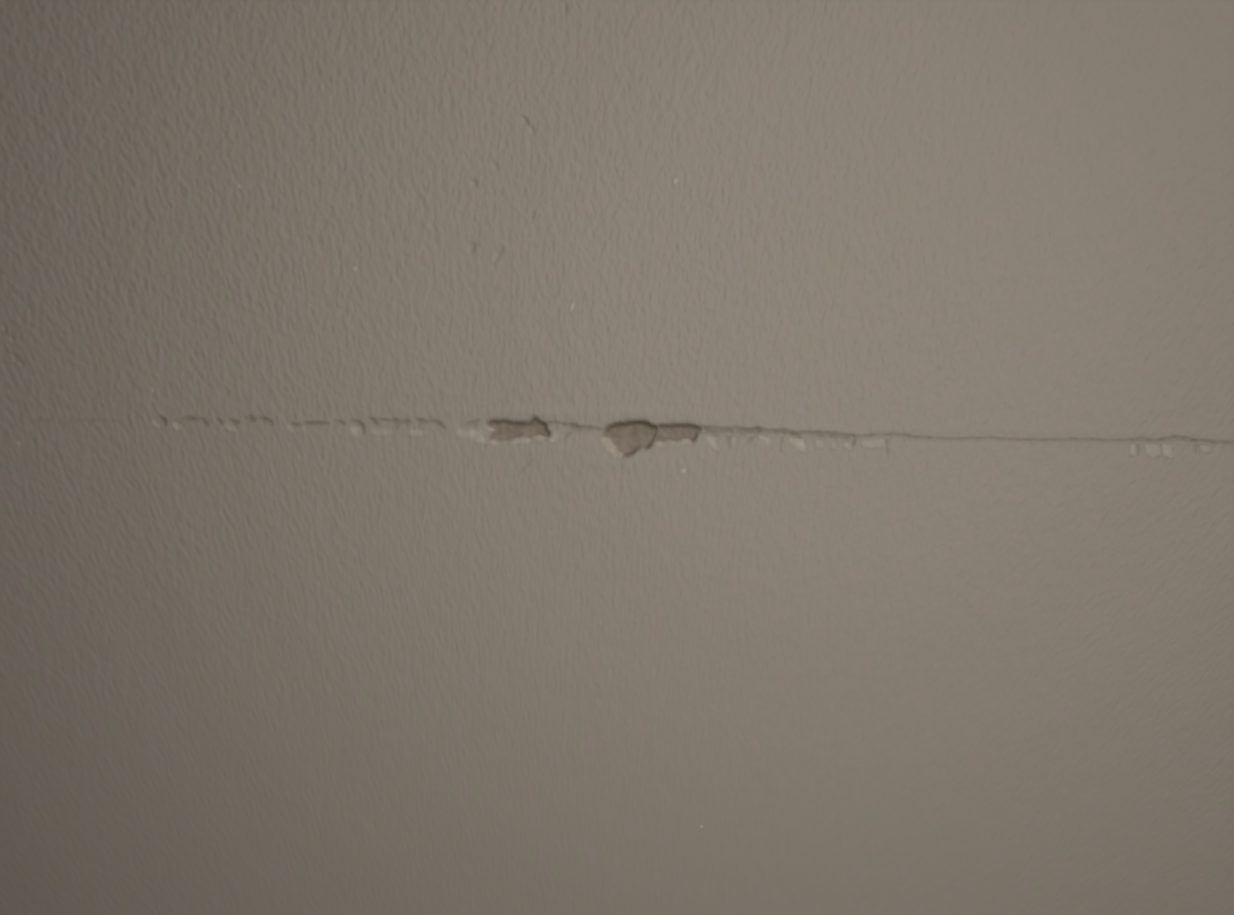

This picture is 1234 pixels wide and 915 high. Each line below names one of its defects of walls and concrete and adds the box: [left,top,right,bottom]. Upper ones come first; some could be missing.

crack [157,414,447,436]
spalling [455,415,553,448]
crack [548,420,604,440]
spalling [599,419,721,460]
crack [700,424,1234,459]